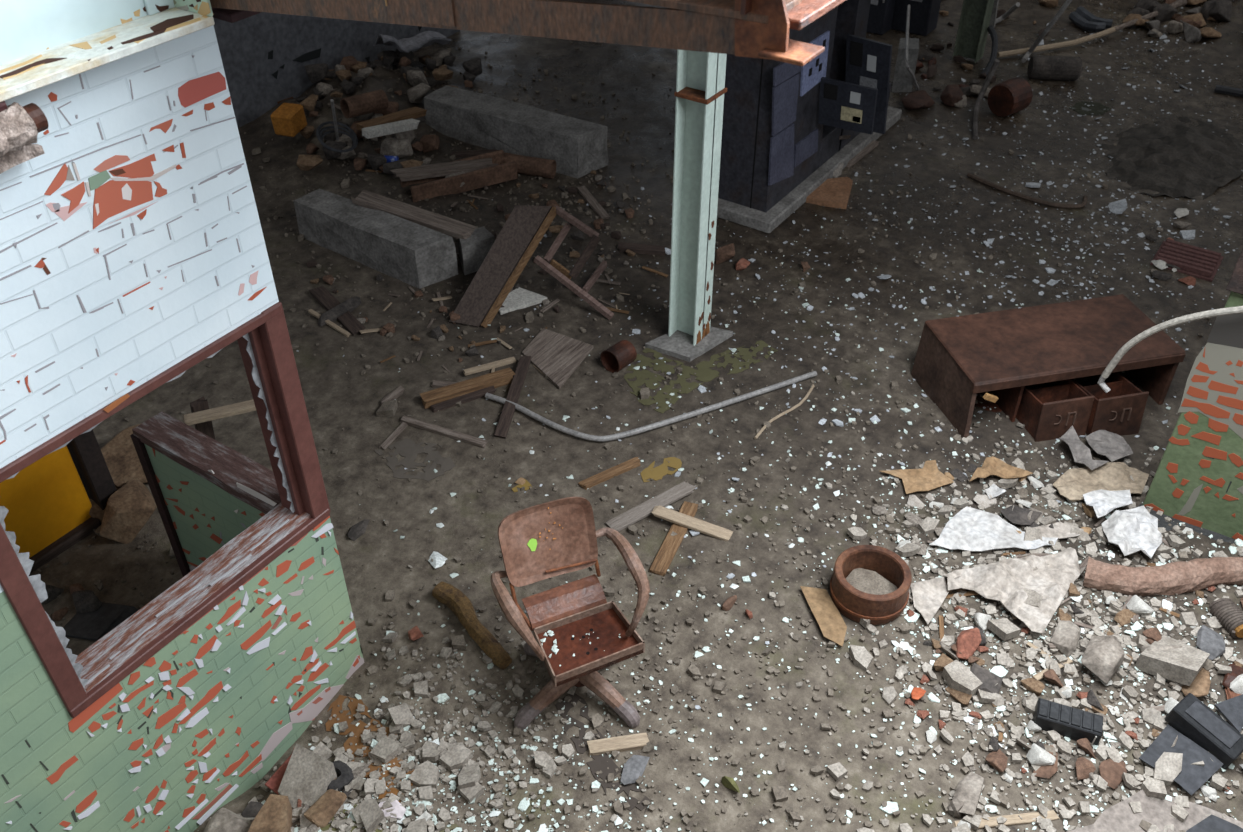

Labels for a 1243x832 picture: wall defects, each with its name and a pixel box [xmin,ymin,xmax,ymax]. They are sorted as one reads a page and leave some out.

corrosion [0,0,214,80]
spalling [149,119,173,133]
flaking render [178,72,226,108]
spalling [44,154,167,229]
flaking render [1166,349,1243,517]
peeling [85,519,289,686]
flaking render [68,557,315,767]
flaking render [271,620,360,724]
peeling [46,755,79,784]
peeling [59,790,98,828]
flaking render [124,780,167,829]
flaking render [182,715,262,818]